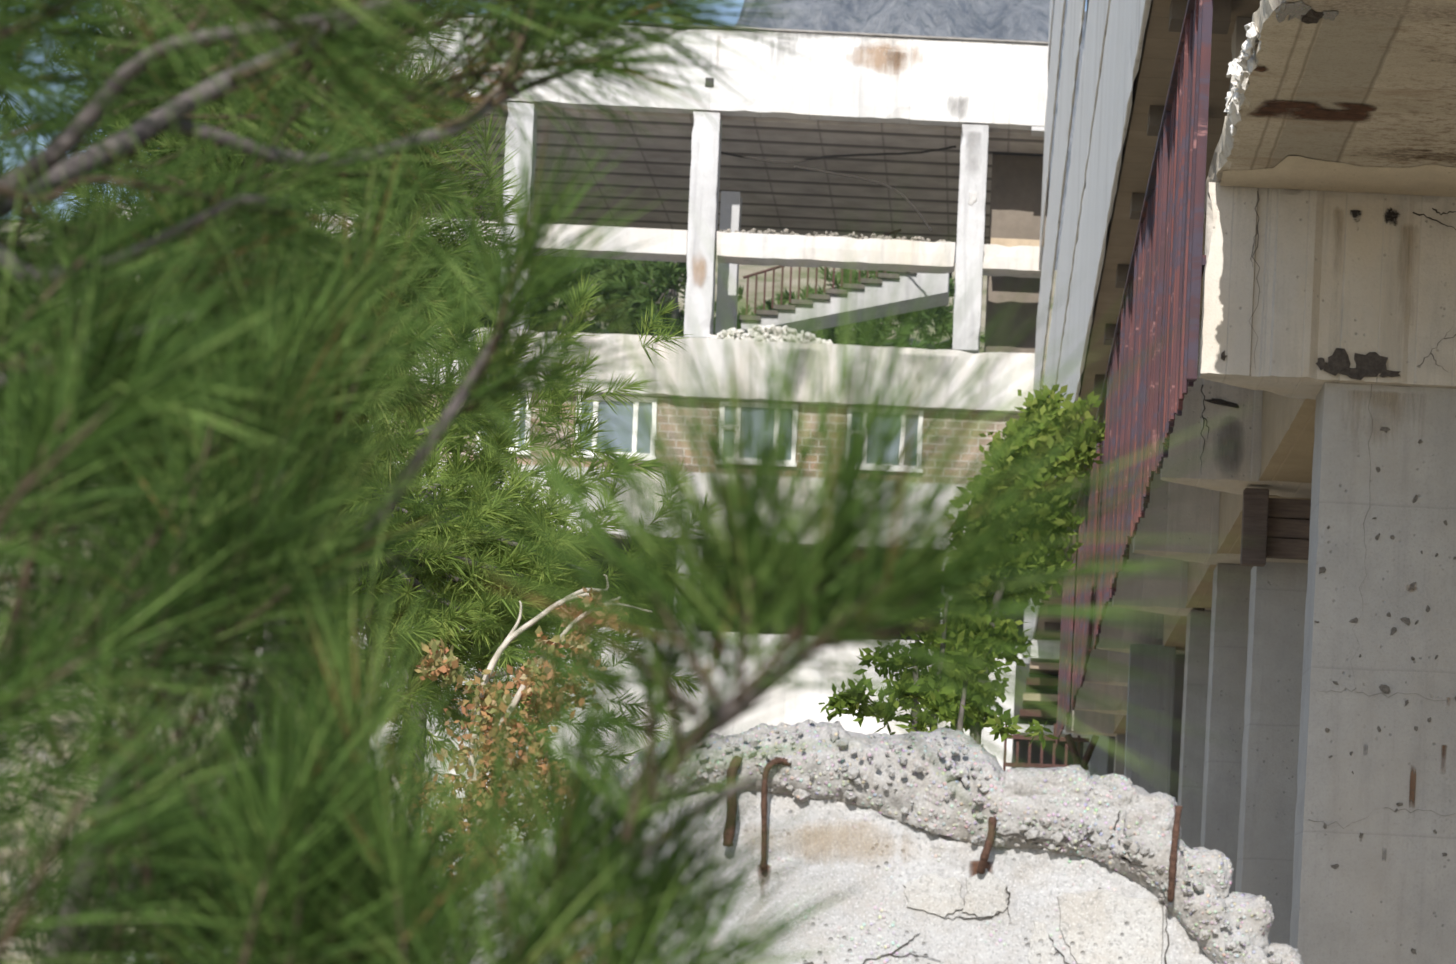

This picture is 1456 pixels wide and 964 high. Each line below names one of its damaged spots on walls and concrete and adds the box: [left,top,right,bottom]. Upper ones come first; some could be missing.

spalling [1274,1,1339,24]
corrosion [861,45,901,68]
spalling [1224,22,1260,136]
corrosion [1250,101,1376,122]
crack [1413,208,1456,230]
spalling [1316,348,1401,380]
crack [1417,332,1456,373]
crack [1200,384,1209,466]
spalling [576,719,1303,964]
corrosion [970,861,991,876]
crack [995,811,1170,964]
crack [863,886,1010,964]